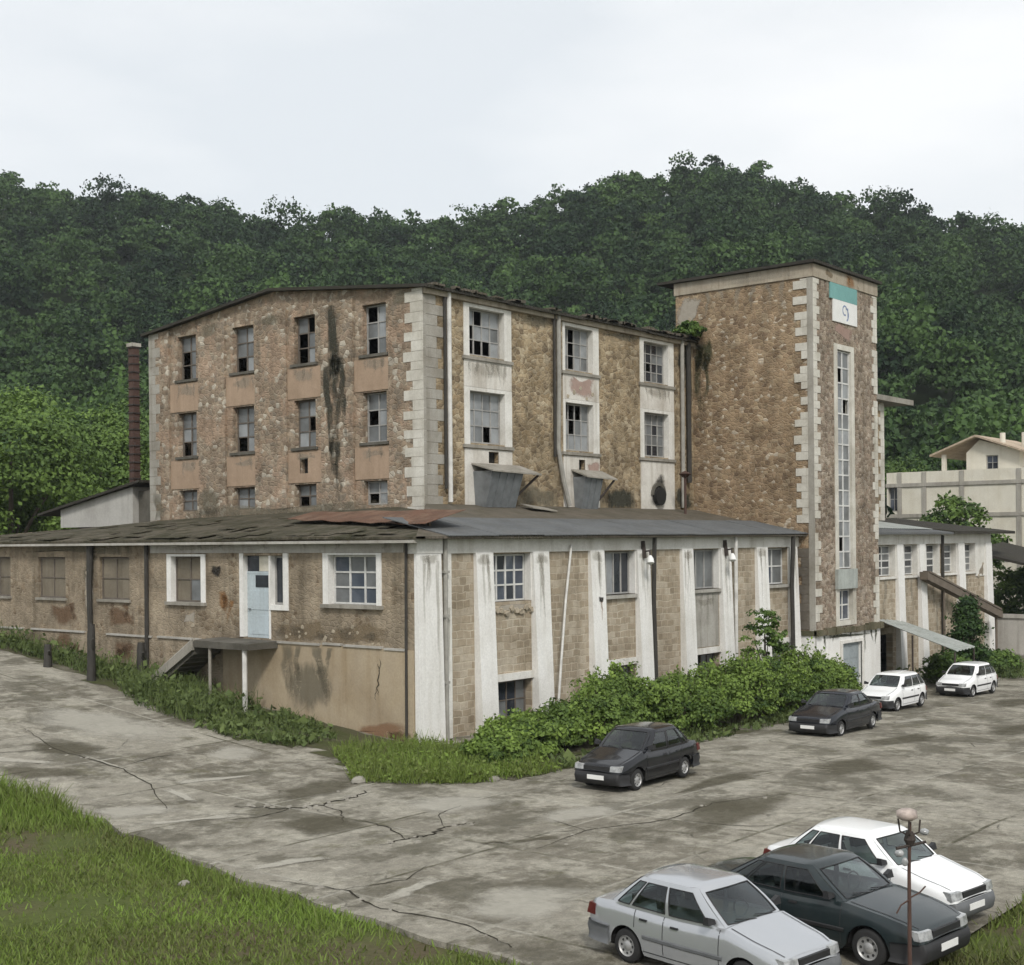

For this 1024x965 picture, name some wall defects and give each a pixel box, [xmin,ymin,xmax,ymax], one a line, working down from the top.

damp [323,305,346,490]
peeling [567,377,594,401]
damp [284,649,331,705]
crack [1,728,211,808]
crack [230,790,512,947]